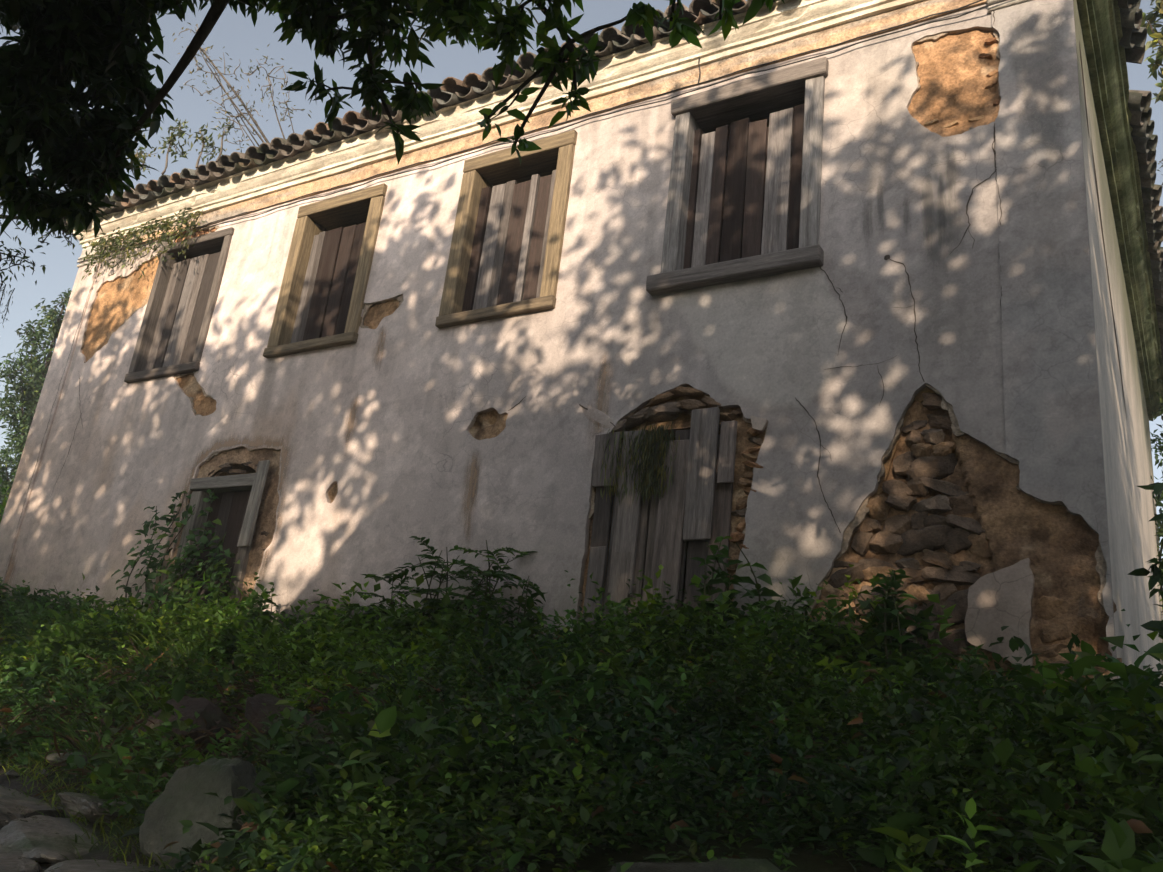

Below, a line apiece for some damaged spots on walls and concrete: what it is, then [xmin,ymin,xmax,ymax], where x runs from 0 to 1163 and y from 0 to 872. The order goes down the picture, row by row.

spalling [908,29,1001,137]
crack [949,123,1002,255]
spalling [81,250,161,363]
spalling [174,373,217,416]
spalling [154,446,281,617]
spalling [328,483,338,503]
spalling [360,295,404,329]
spalling [469,409,508,440]
spalling [611,385,768,608]
crack [795,397,841,533]
crack [819,259,925,406]
spalling [801,384,1122,694]